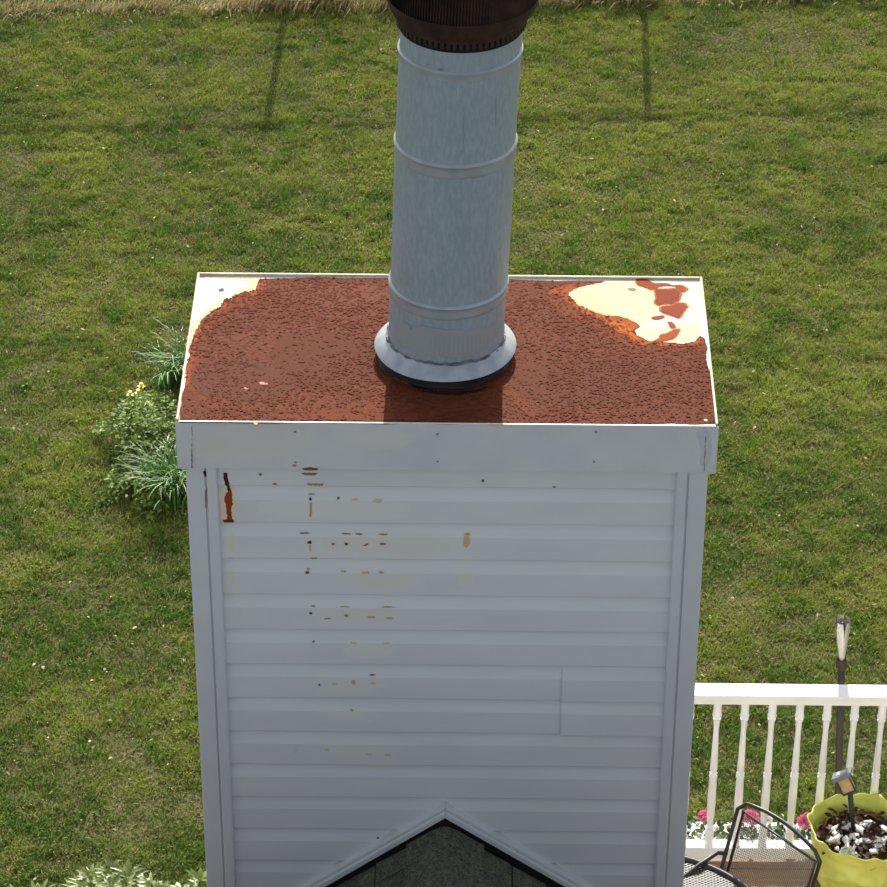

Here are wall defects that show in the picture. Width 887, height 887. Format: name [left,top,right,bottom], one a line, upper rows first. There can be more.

rust [179,277,715,425]
rust [220,473,237,523]
rust [291,464,324,517]